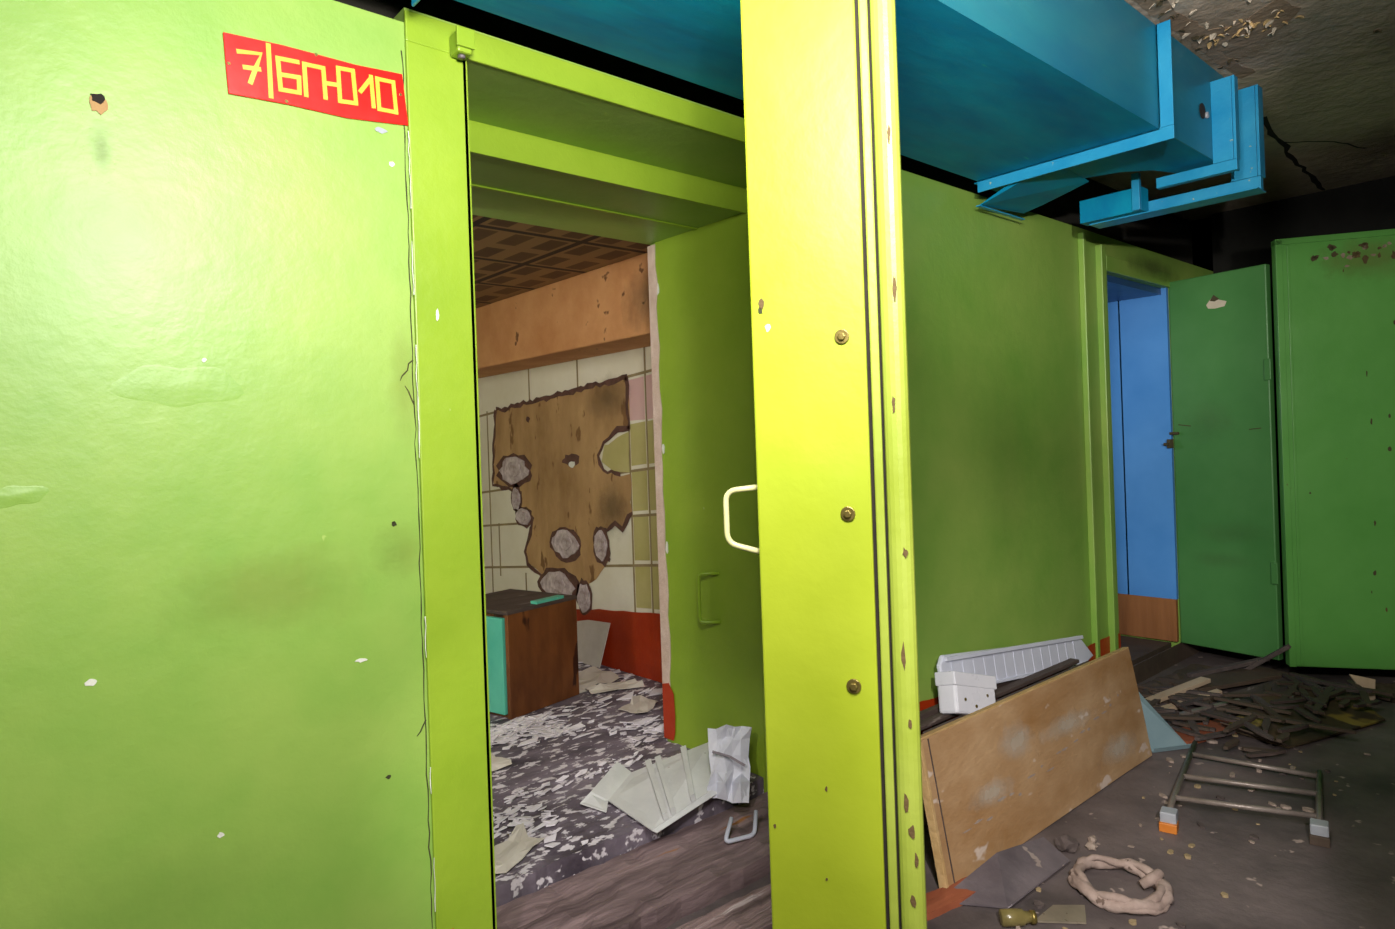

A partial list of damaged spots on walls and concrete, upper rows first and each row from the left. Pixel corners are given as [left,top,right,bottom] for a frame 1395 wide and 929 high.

peeling [1132,0,1305,79]
spalling [89,93,108,115]
crack [1263,116,1365,190]
spalling [492,374,630,496]
spalling [524,523,542,576]
spalling [606,512,633,533]